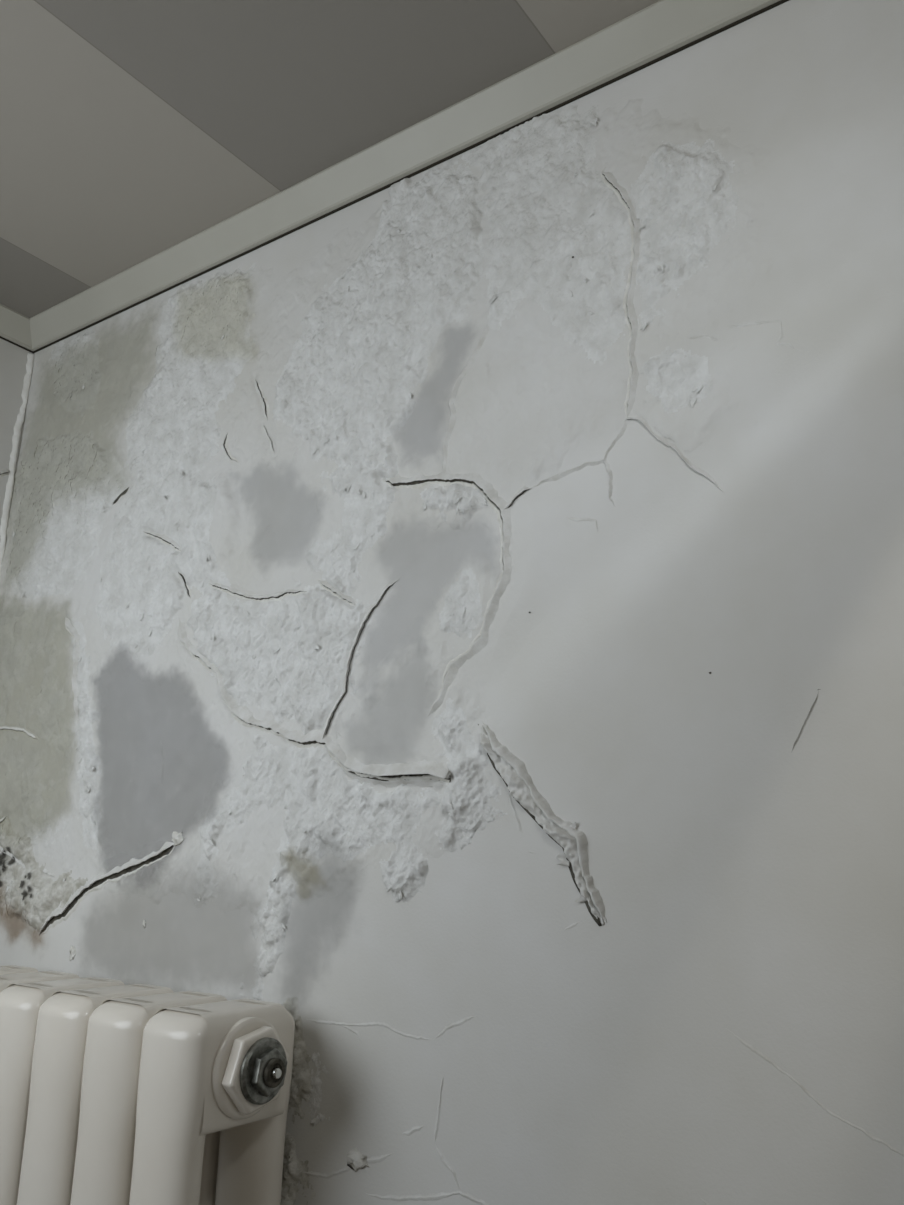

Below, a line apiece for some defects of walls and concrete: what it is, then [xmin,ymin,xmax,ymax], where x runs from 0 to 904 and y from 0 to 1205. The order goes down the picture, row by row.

crack [0,468,10,477]
crack [221,432,239,464]
crack [255,379,275,454]
peeling [70,104,631,1000]
crack [383,167,723,716]
crack [143,531,451,788]
flaking render [0,813,88,942]
flaking render [281,996,316,1205]